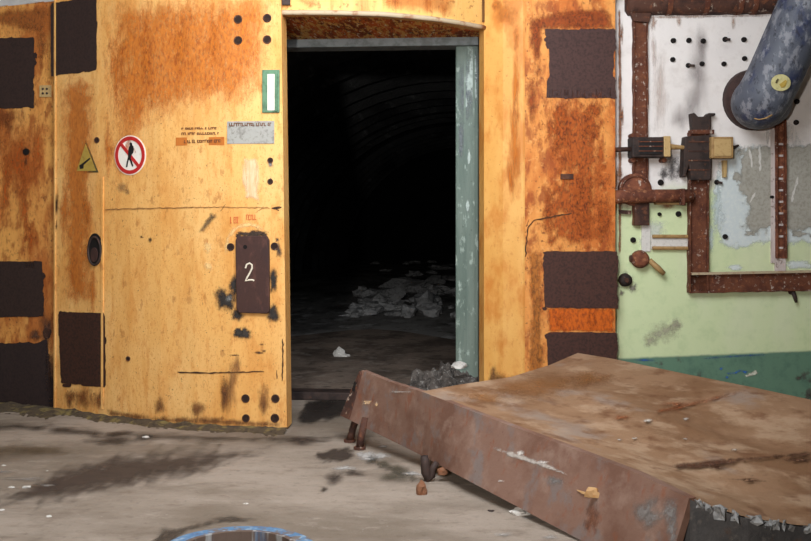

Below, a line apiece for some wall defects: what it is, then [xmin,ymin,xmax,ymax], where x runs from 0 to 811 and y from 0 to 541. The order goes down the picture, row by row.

corrosion [0,9,45,58]
corrosion [60,81,95,302]
corrosion [111,2,263,132]
corrosion [509,118,519,188]
corrosion [528,81,536,115]
corrosion [531,10,623,252]
peeling [709,146,771,249]
spalling [786,144,811,246]
corrosion [529,253,614,371]
damp [5,425,158,444]
damp [14,452,237,498]
damp [317,446,420,491]